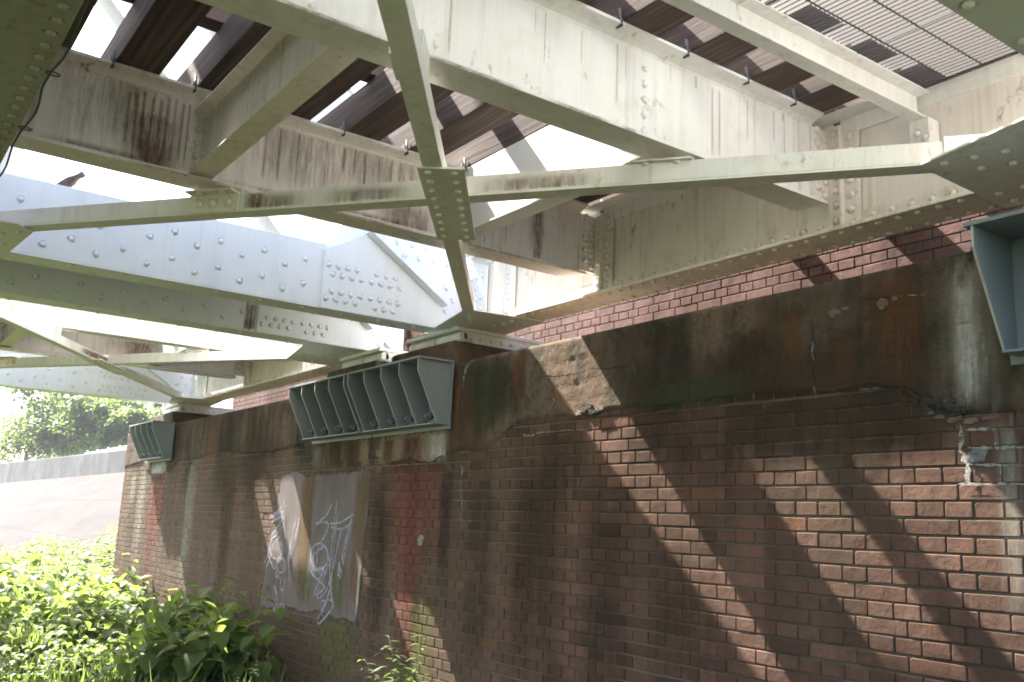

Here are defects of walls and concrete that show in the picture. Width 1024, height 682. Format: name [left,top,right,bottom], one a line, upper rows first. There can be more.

damp [954,269,987,390]
spalling [574,402,604,417]
spalling [918,397,996,425]